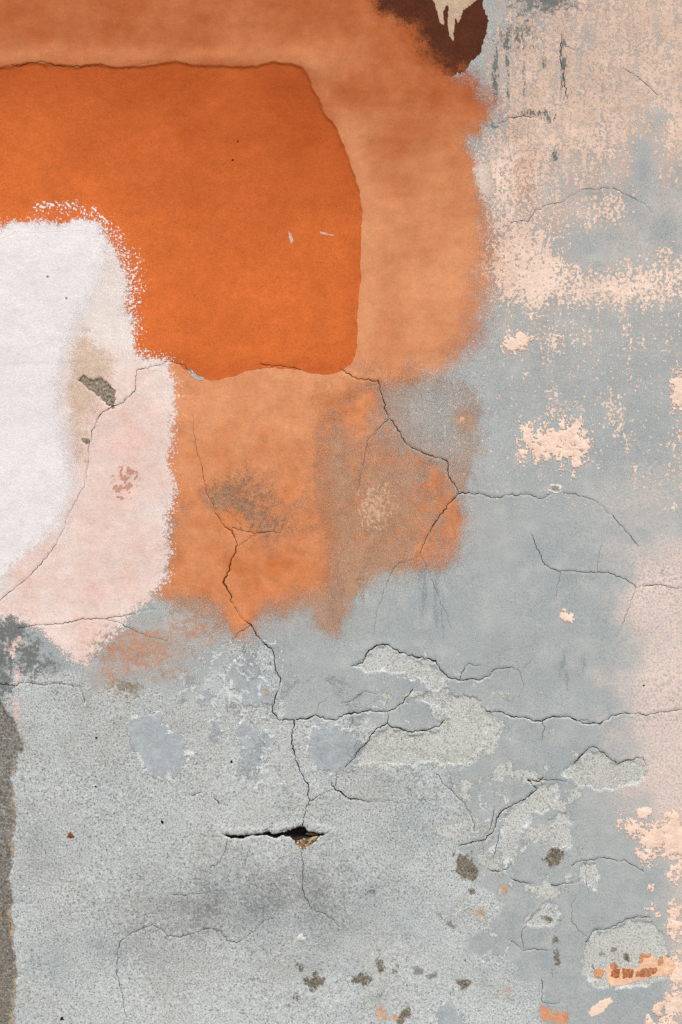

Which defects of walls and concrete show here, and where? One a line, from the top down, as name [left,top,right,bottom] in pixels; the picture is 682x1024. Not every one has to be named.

peeling [420,0,682,511]
crack [0,361,195,600]
crack [193,370,637,826]
crack [533,538,678,635]
crack [115,839,340,1015]
flaking render [171,640,648,936]
crack [433,709,682,952]
flaking render [580,807,682,1024]